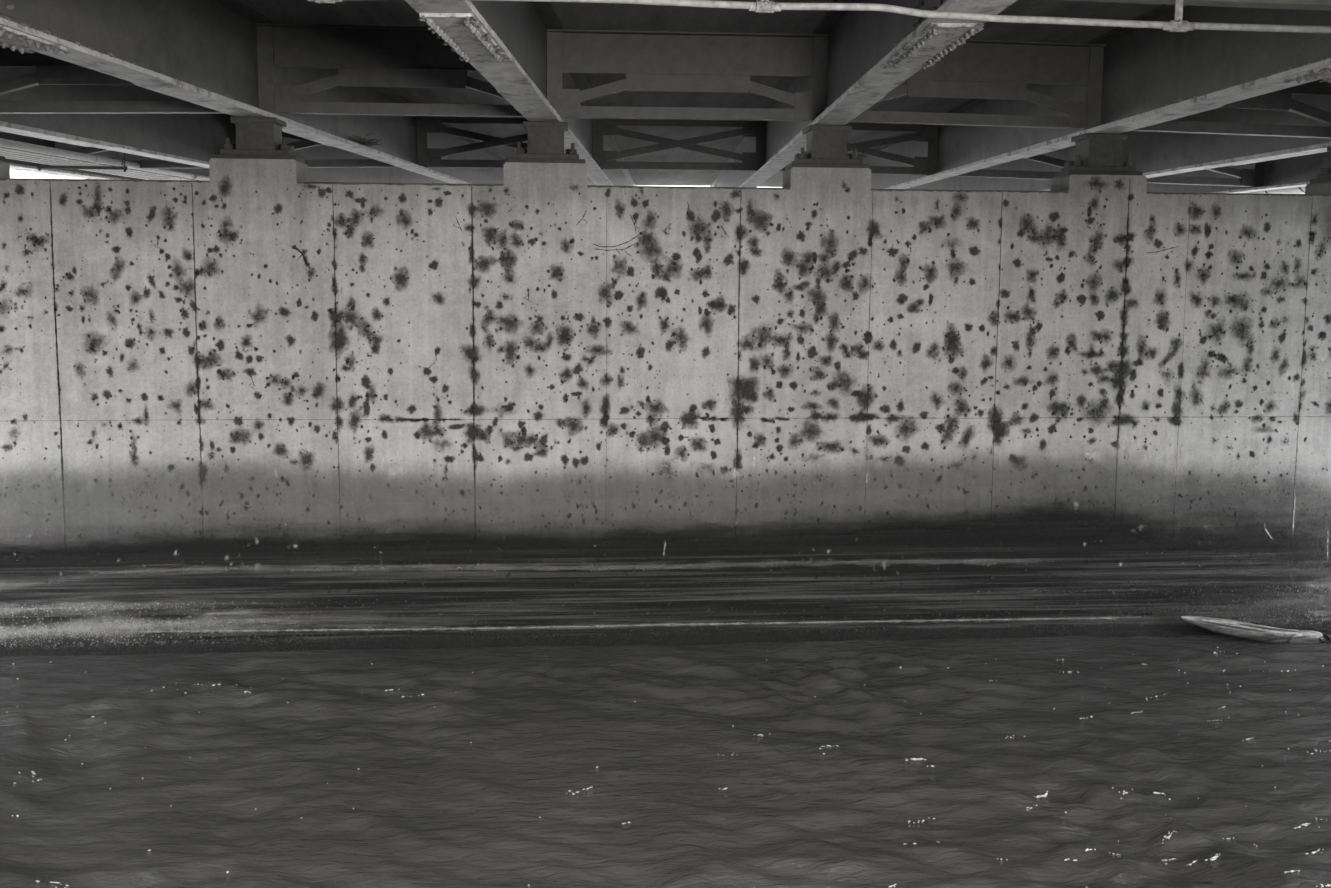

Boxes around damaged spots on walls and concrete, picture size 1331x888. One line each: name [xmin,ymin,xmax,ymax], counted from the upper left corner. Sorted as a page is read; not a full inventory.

water stain [0,177,1331,657]